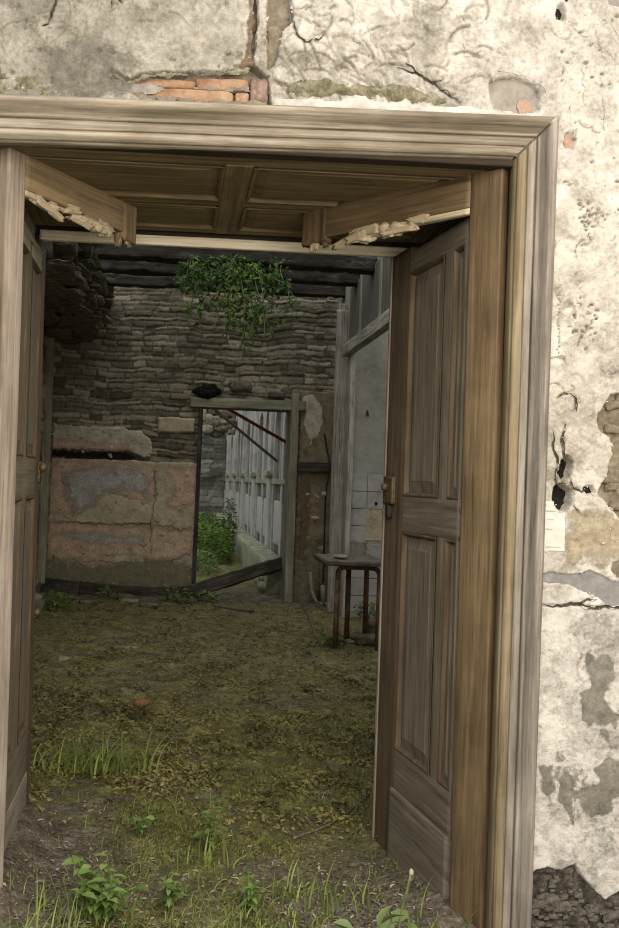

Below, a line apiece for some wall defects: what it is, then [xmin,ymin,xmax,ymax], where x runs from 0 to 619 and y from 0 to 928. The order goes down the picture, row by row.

crack [293,21,324,43]
flaking render [106,56,272,105]
crack [398,63,460,103]
flaking render [552,437,574,510]
crack [544,598,619,610]